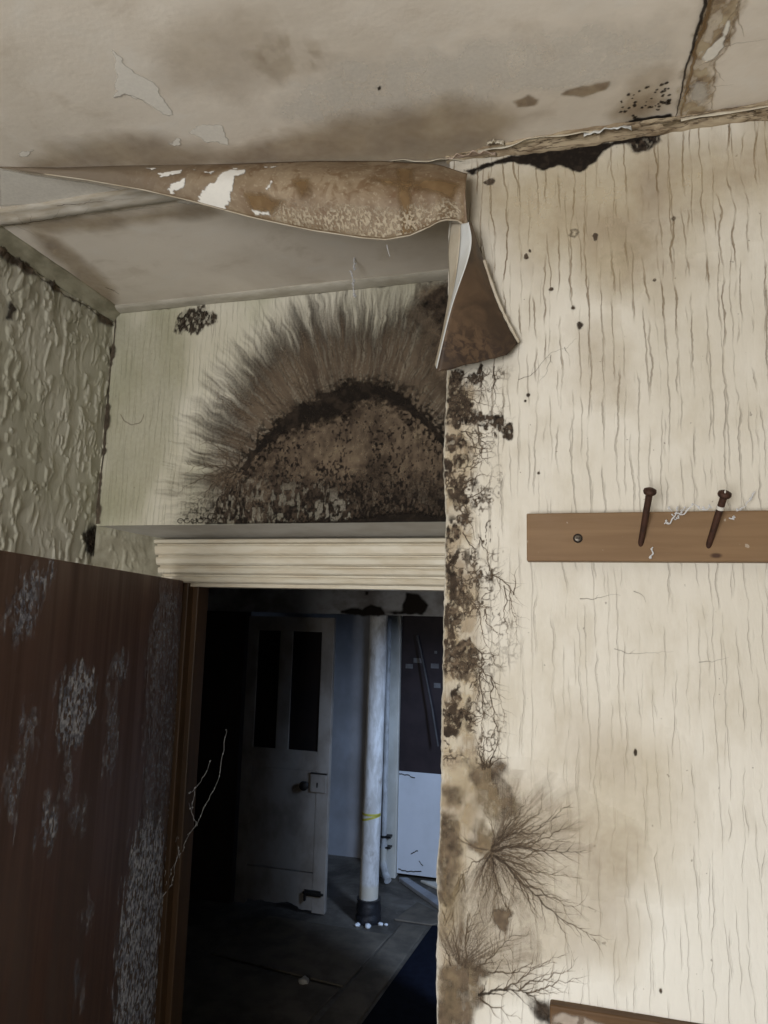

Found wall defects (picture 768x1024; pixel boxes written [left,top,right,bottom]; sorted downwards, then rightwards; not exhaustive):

damp [517,97,536,106]
damp [565,83,609,96]
damp [619,82,671,119]
peeling [681,106,768,121]
damp [467,135,660,185]
peeling [0,169,117,205]
damp [174,305,217,335]
damp [182,282,474,683]
damp [438,696,597,943]